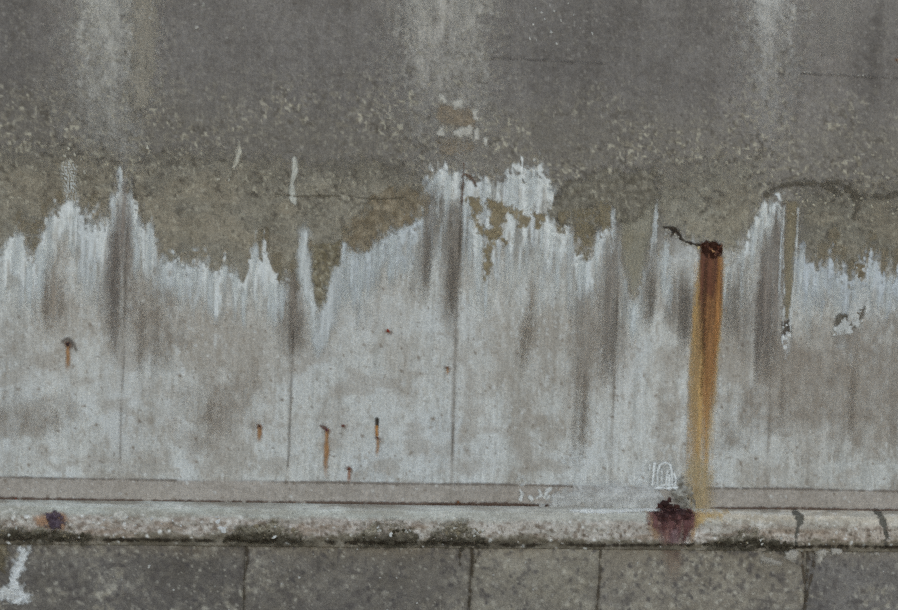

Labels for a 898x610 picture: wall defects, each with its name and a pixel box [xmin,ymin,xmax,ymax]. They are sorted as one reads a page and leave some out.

leakage [383,0,500,137]
corrosion [62,337,77,364]
leakage [0,167,303,347]
corrosion [320,425,329,465]
leakage [337,156,693,409]
corrosion [648,240,723,543]
leakage [721,192,898,431]
spalling [833,306,866,336]